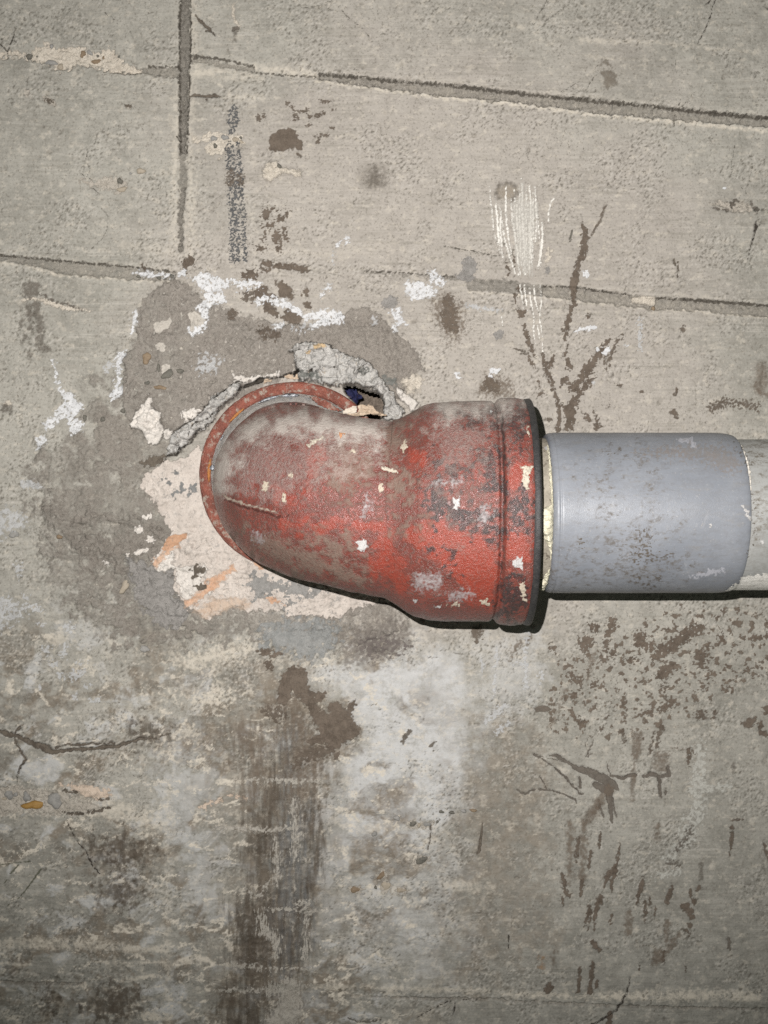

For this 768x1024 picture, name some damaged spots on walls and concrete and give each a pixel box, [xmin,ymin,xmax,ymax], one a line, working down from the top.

leakage [132,268,345,337]
leakage [388,307,409,333]
leakage [404,269,445,301]
leakage [521,205,607,433]
leakage [103,349,128,402]
leakage [195,351,225,374]
spalling [139,341,425,468]
leakage [651,738,733,882]
leakage [213,700,324,1024]